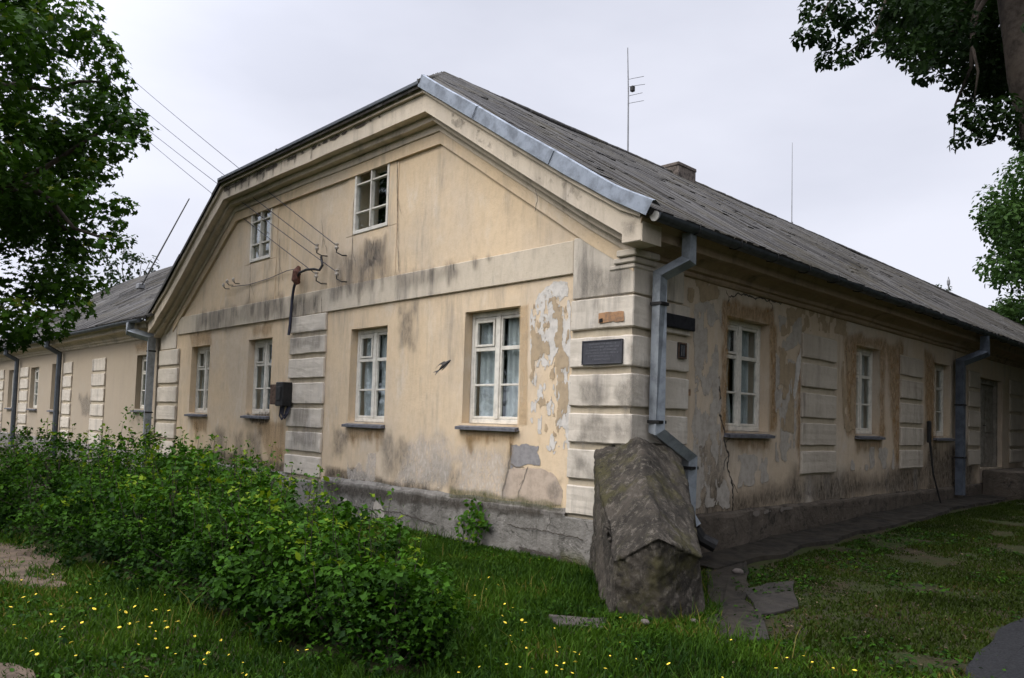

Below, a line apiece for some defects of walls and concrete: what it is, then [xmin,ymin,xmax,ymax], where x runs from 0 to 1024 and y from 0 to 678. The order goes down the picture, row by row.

peeling [529,281,571,458]
peeling [687,279,730,509]
crack [719,376,738,510]
peeling [775,349,801,462]
damp [697,443,973,514]